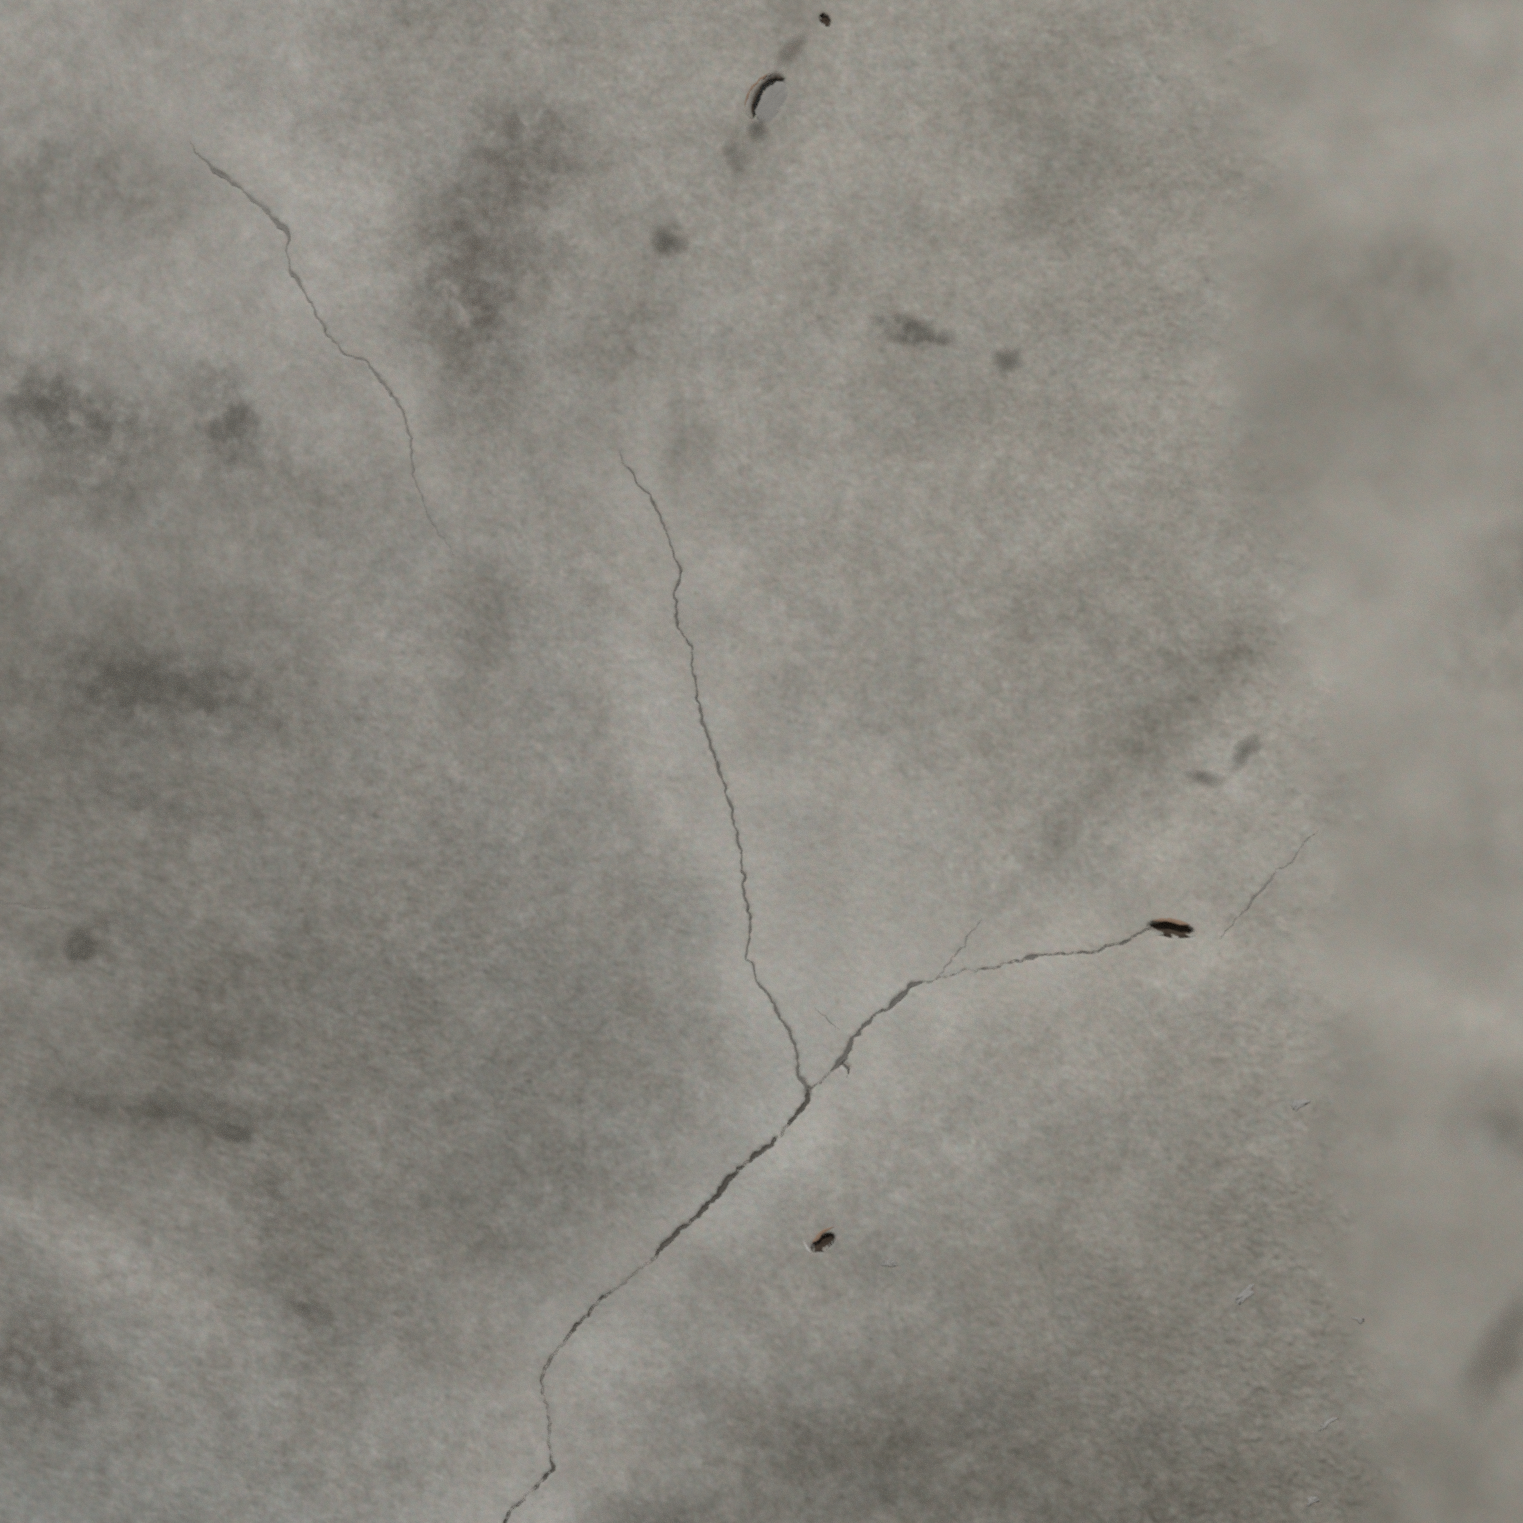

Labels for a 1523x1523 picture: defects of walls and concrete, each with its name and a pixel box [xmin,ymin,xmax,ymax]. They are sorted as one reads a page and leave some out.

crack [190,142,451,550]
crack [503,451,1151,1523]
crack [1219,832,1317,939]